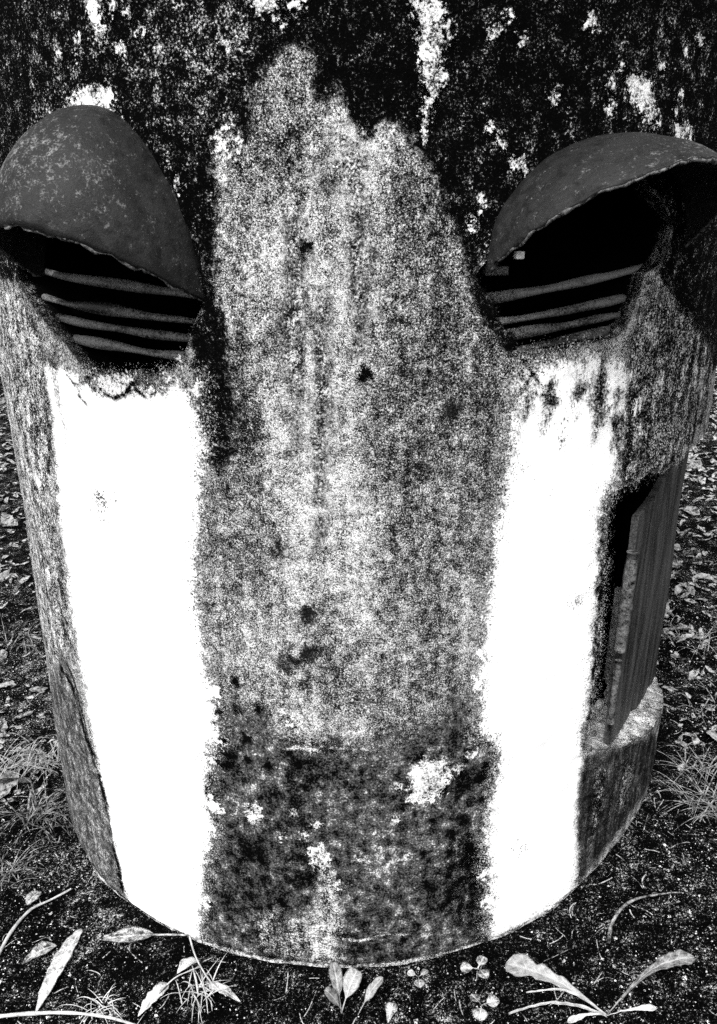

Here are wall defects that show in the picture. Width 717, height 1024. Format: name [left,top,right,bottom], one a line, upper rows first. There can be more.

damp [0,0,717,557]
damp [93,676,561,968]